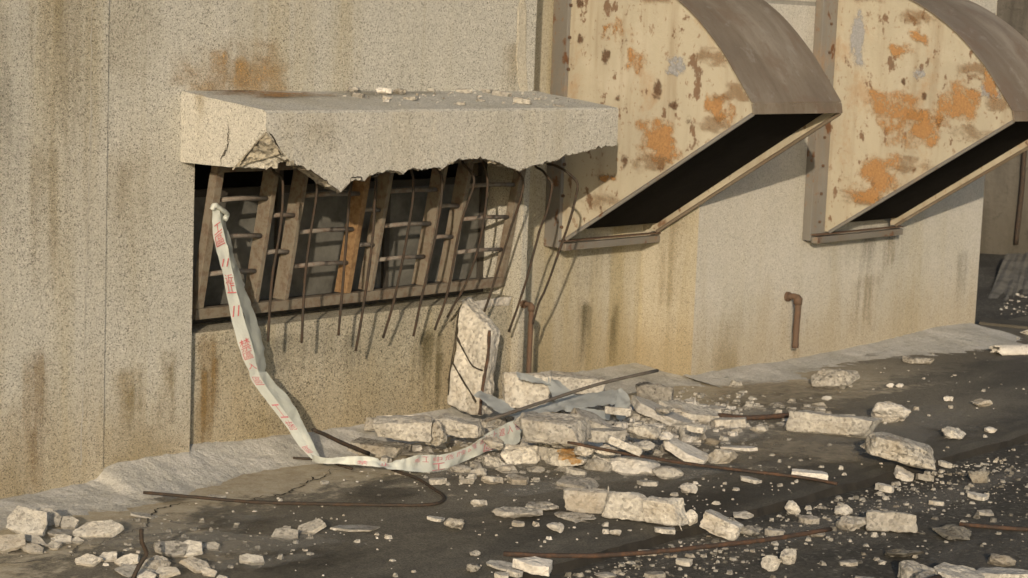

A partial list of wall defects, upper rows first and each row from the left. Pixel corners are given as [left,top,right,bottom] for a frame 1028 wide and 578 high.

rust [889,31,927,58]
rust [704,94,735,123]
rust [869,68,998,147]
crack [220,124,281,165]
rust [636,119,681,164]
rust [851,155,901,204]
spalling [232,132,616,351]